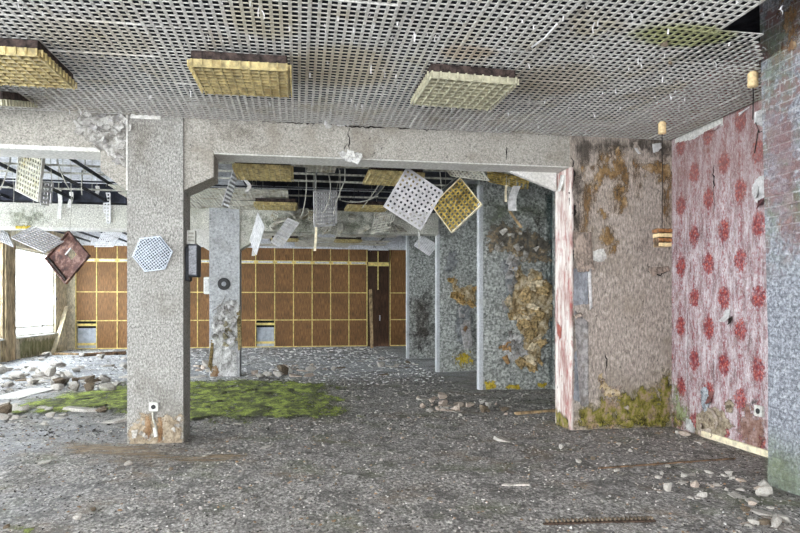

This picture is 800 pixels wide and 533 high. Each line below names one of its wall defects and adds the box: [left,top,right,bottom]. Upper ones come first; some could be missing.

peeling [73,107,132,166]
crack [262,121,438,149]
leakage [573,138,672,256]
peeling [208,296,242,377]
leakage [409,287,434,350]
flaking render [444,249,477,351]
flaking render [484,220,562,373]
spalling [127,412,184,444]
spalling [685,387,766,449]